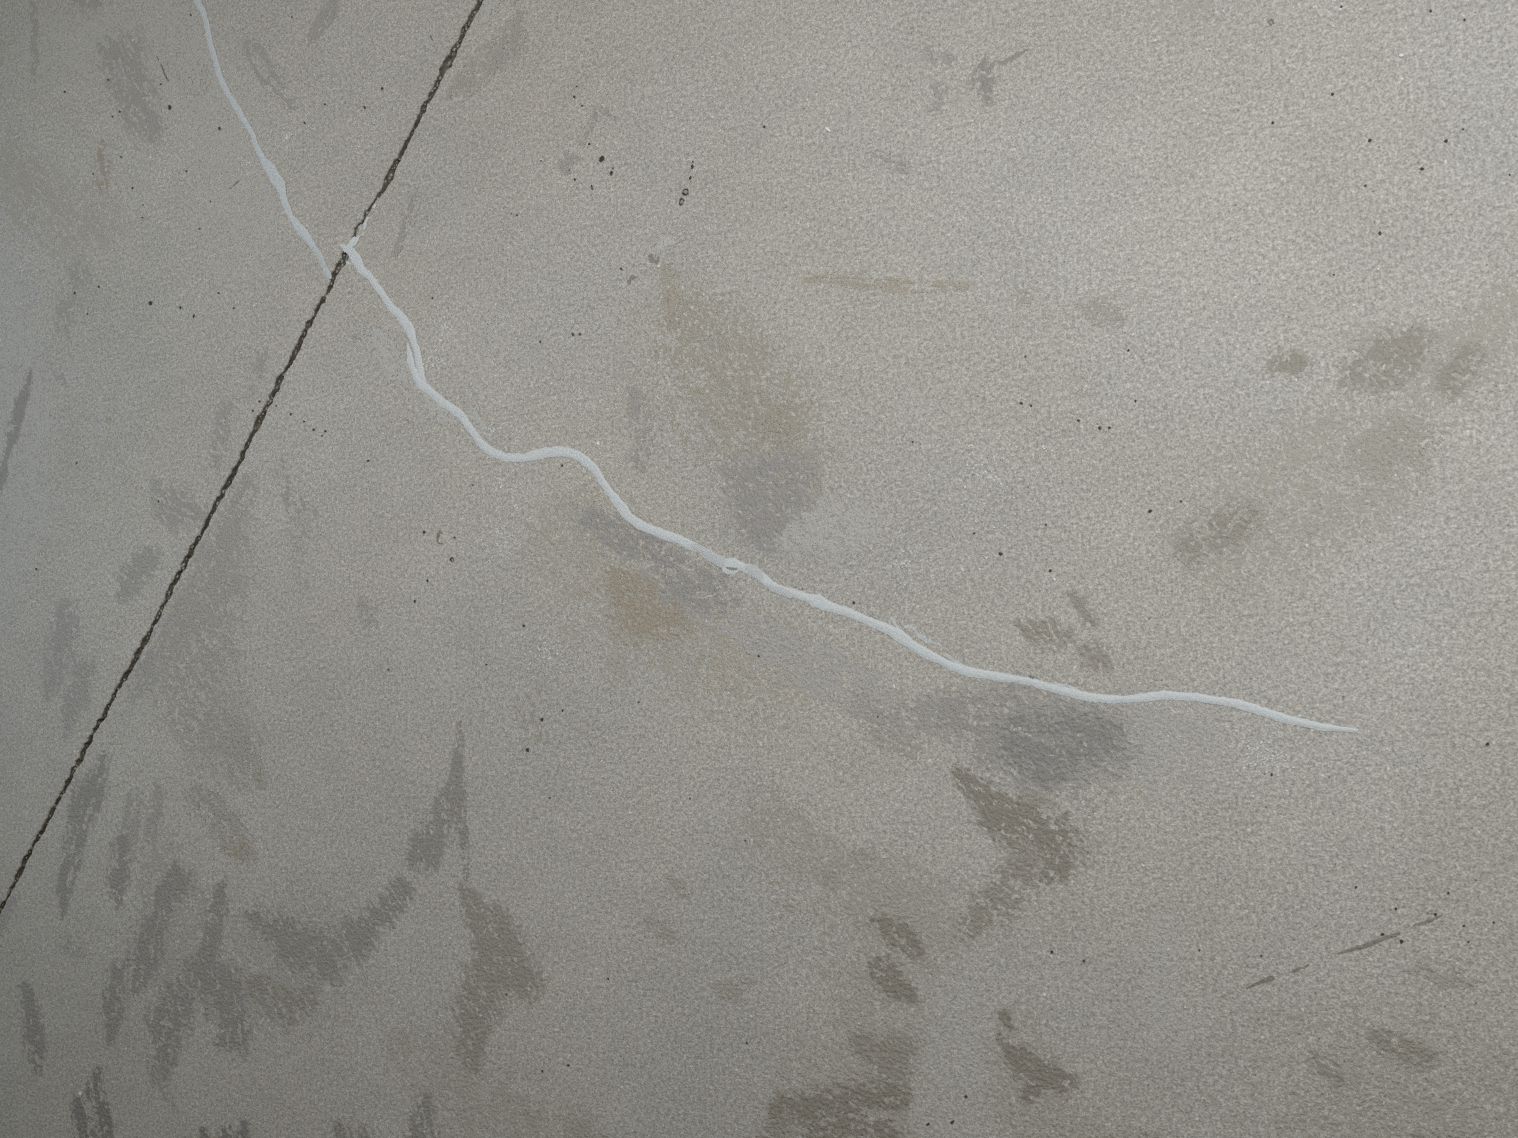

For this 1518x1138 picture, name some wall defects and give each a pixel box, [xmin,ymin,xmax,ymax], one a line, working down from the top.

crack [691,543,793,599]
crack [889,614,942,647]